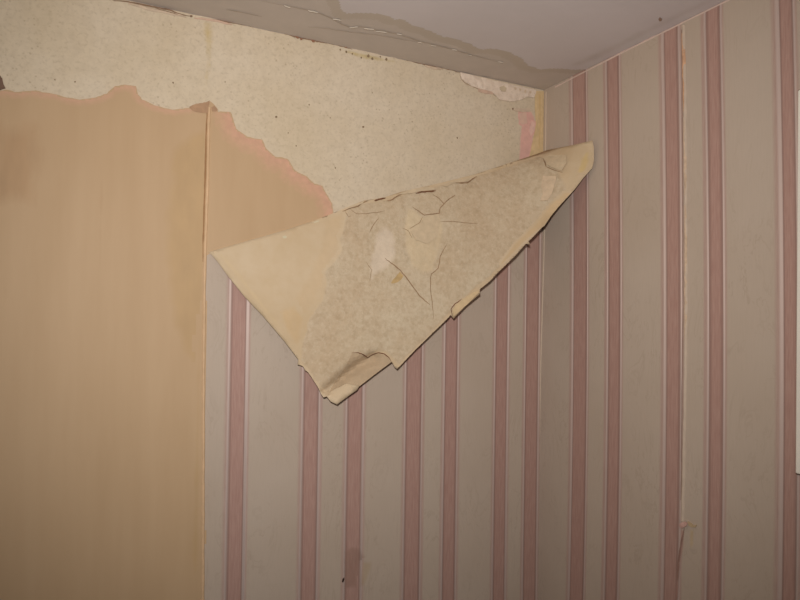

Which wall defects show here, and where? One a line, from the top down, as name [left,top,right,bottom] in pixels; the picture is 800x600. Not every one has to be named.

peeling [0,0,594,404]